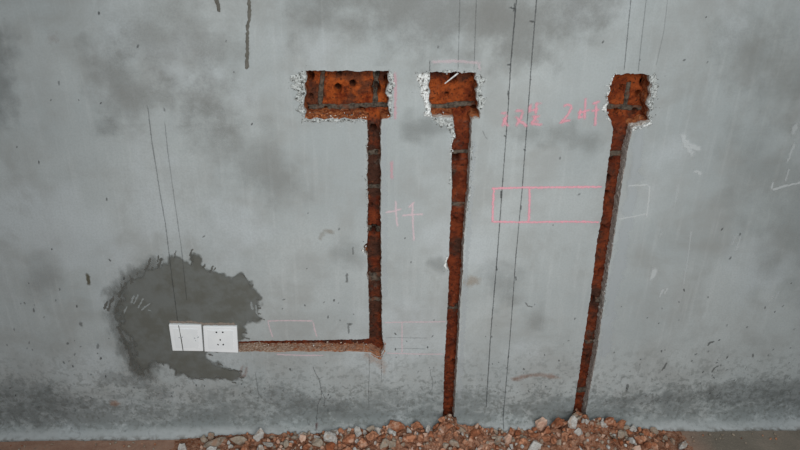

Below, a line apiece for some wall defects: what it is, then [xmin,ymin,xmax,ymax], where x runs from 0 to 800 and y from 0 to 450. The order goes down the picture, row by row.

spalling [238,65,396,359]
flaking render [410,71,456,226]
spalling [442,68,487,418]
spalling [576,69,660,415]